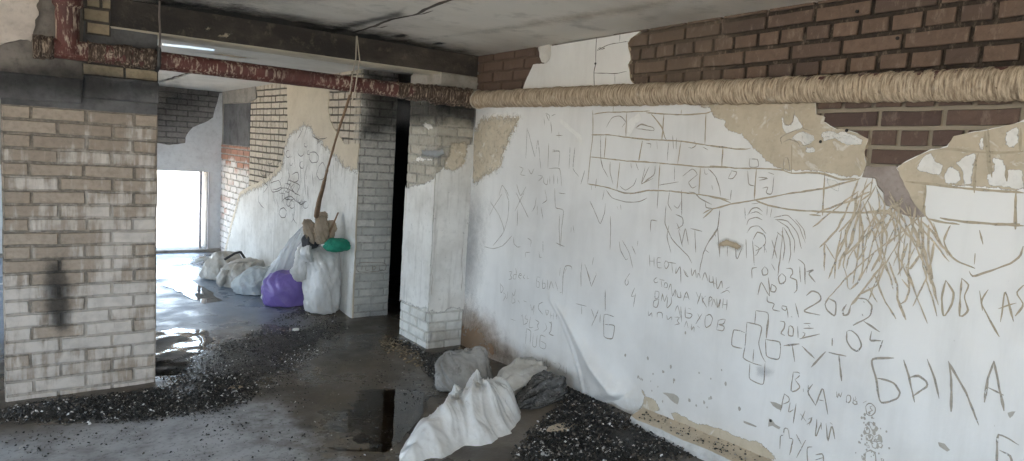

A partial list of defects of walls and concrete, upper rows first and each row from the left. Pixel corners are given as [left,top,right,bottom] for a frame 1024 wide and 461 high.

flaking render [613,0,1024,84]
peeling [444,116,519,183]
flaking render [701,100,1024,218]
peeling [637,365,774,460]
flaking render [855,412,890,461]